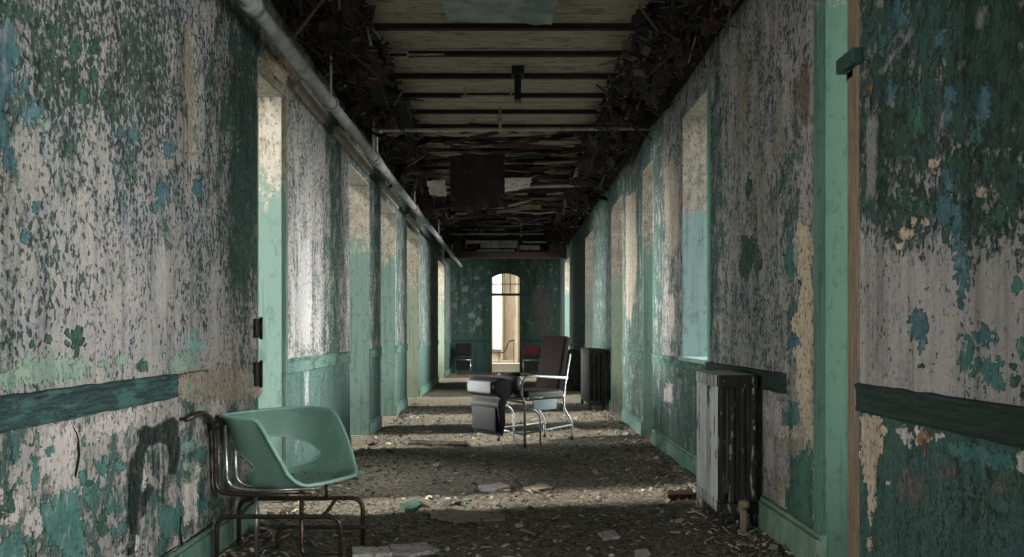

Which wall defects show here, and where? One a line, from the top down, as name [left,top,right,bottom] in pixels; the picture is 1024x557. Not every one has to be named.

peeling [0,0,50,173]
spalling [625,188,638,324]
peeling [895,158,973,311]
spalling [167,326,263,419]
spalling [663,381,674,405]
spalling [763,217,814,527]
peeling [906,307,929,369]
peeling [956,321,1024,393]
spalling [0,402,158,557]
leakage [128,417,181,555]
peeling [157,437,209,539]
spalling [859,413,1024,552]